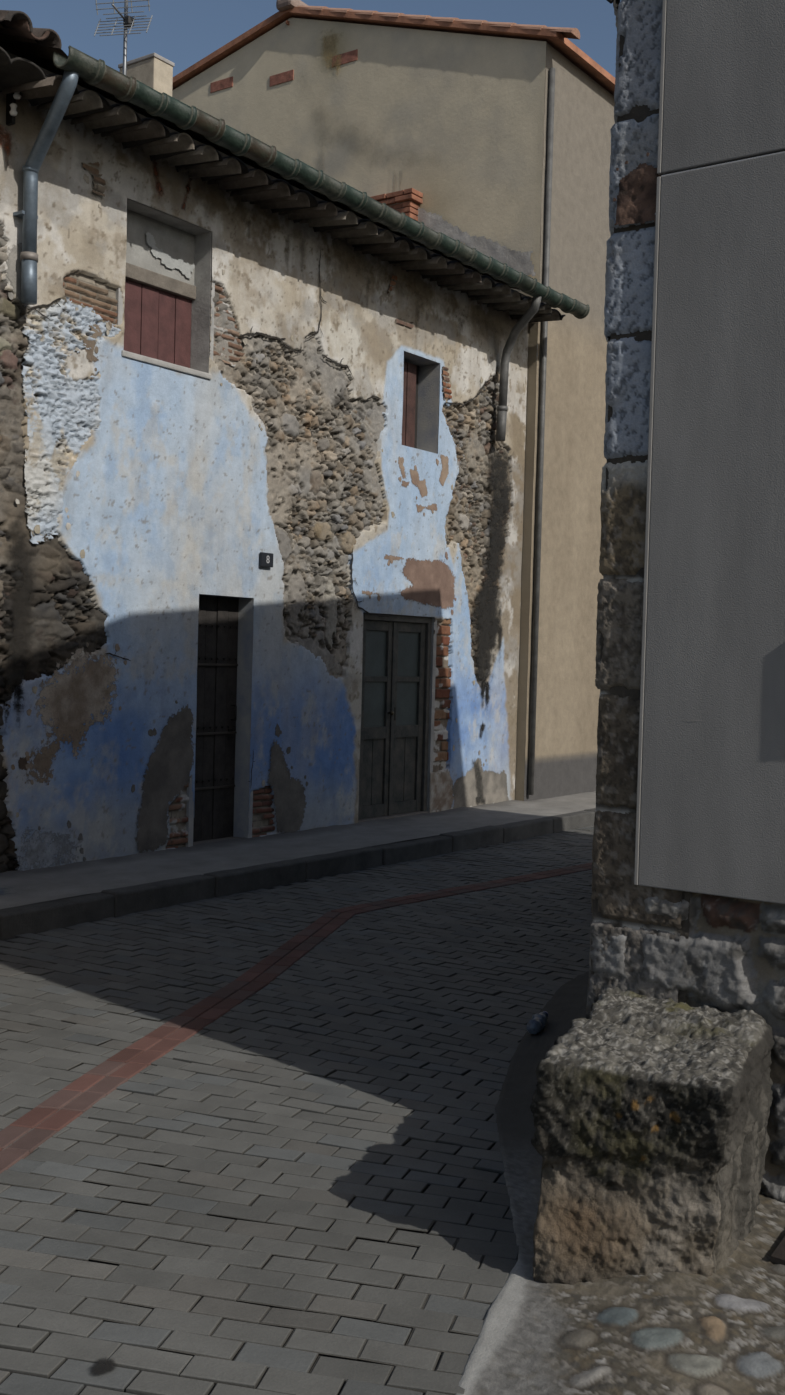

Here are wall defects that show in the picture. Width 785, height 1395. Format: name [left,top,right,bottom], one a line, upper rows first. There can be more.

peeling [15,270,121,544]
flaking render [213,269,247,371]
flaking render [441,366,453,400]
damp [473,449,512,706]
peeling [11,642,127,785]
flaking render [384,552,509,813]
flaking render [252,779,275,837]